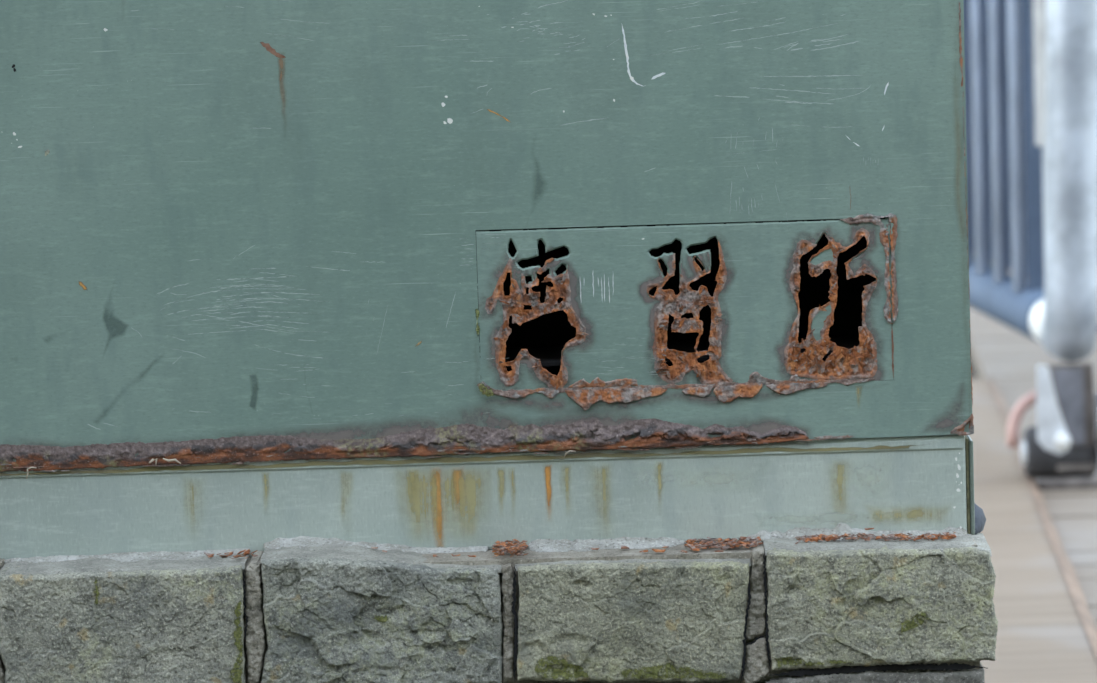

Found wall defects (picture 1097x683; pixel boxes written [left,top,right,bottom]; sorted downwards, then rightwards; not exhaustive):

corrosion [260,42,286,94]
corrosion [495,259,593,368]
corrosion [639,252,710,350]
corrosion [675,373,721,403]
corrosion [0,399,914,539]